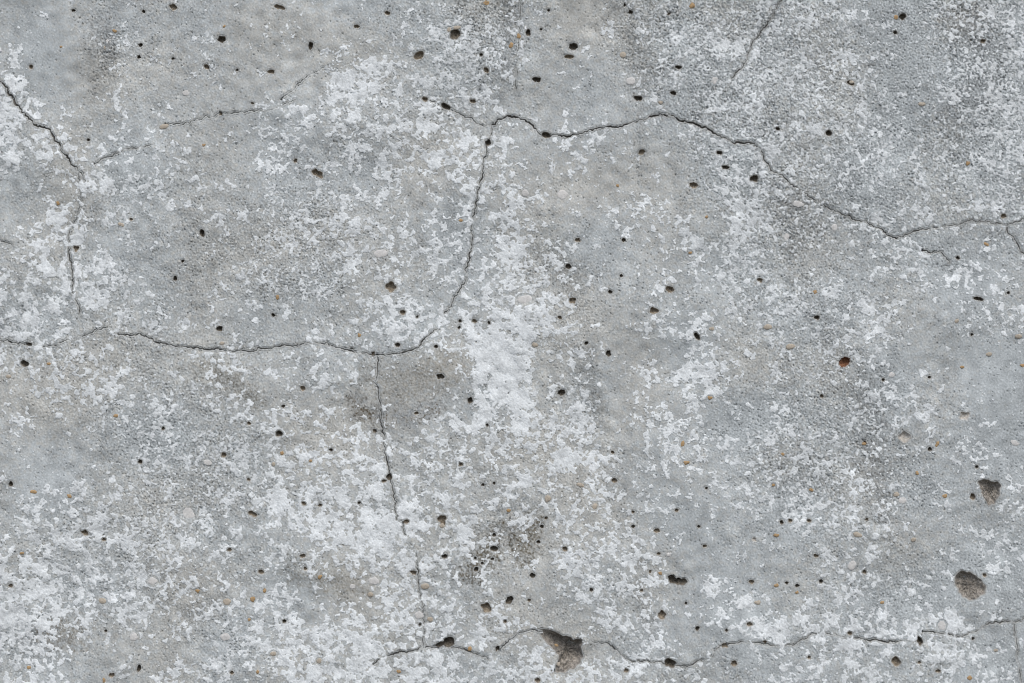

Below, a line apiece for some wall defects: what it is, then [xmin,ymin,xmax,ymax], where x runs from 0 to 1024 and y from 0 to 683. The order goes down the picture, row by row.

crack [166,58,342,126]
crack [723,0,783,95]
crack [0,80,156,320]
crack [0,326,107,348]
crack [119,99,1024,665]
crack [582,617,1024,683]